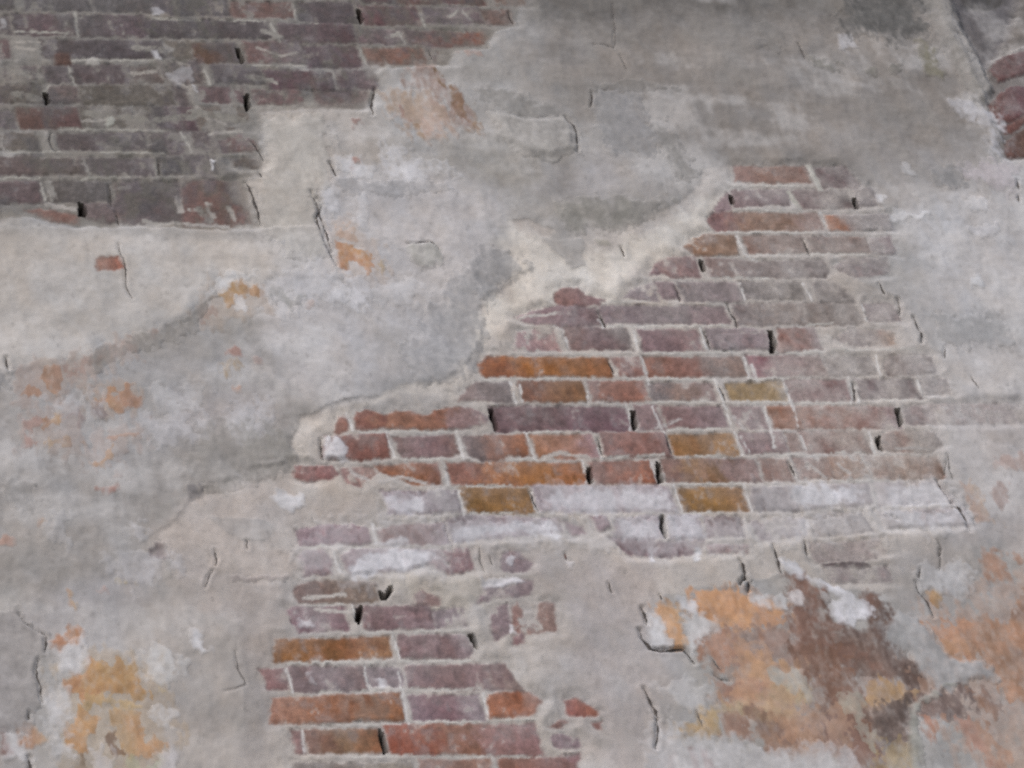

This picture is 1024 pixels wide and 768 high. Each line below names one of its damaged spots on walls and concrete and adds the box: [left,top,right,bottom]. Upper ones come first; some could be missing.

spalling [0,0,527,288]
spalling [985,48,1024,161]
crack [313,198,337,266]
spalling [155,159,1024,768]
crack [19,615,47,721]
crack [644,689,659,749]